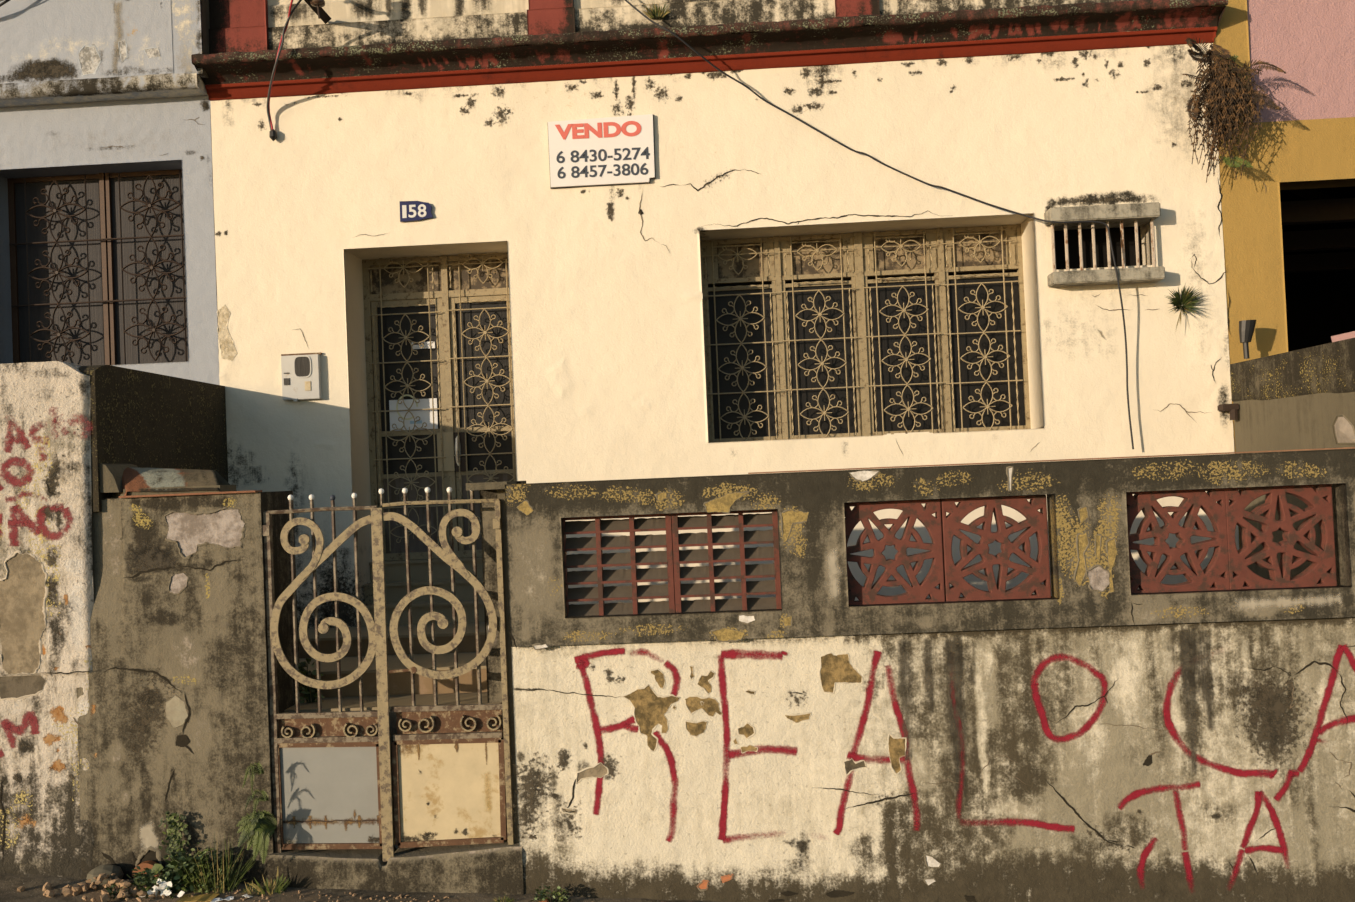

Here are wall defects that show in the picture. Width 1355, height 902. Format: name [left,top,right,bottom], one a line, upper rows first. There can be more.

leakage [356,0,424,18]
crack [638,169,759,251]
crack [698,211,952,229]
spalling [164,507,246,595]
spalling [0,550,49,700]
peeling [622,665,723,752]
peeling [819,653,864,694]
leakage [899,637,975,791]
leakage [1172,629,1214,774]
leakage [1233,668,1317,765]
corrosion [284,811,379,830]
crack [555,779,582,838]